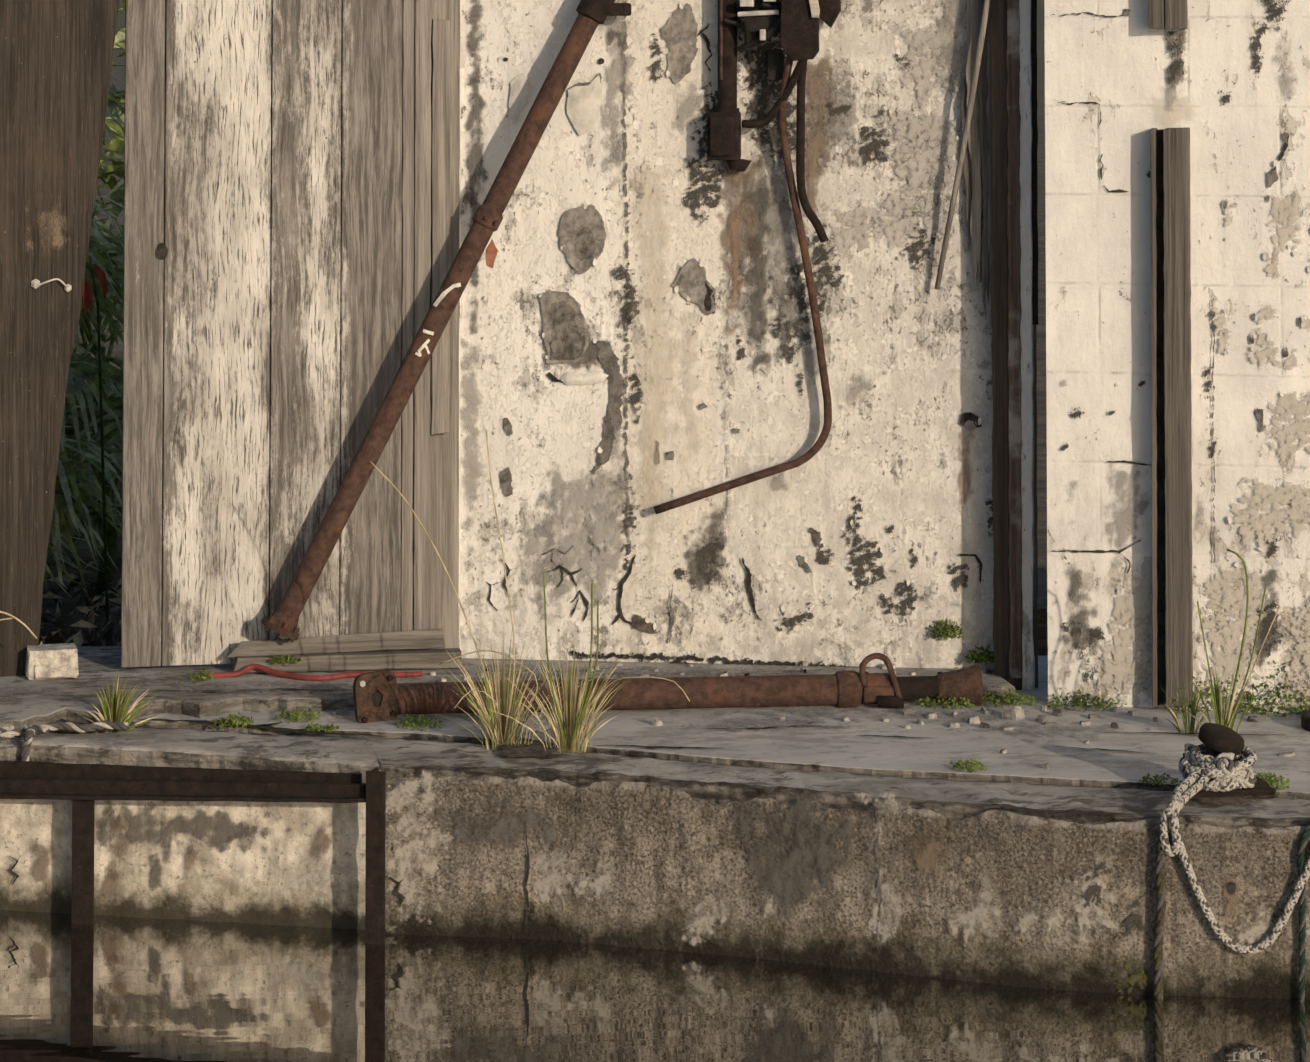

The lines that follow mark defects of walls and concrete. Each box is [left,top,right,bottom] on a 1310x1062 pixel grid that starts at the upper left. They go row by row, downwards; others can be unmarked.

peeling [660,2,698,83]
crack [1052,10,1124,18]
spalling [558,202,607,274]
spalling [671,258,716,315]
crack [486,0,851,667]
spalling [538,289,624,516]
water stain [813,496,918,631]
crack [1052,540,1141,574]
crack [524,835,535,933]
water stain [682,900,726,945]
water stain [869,869,902,942]
water stain [1238,912,1275,943]